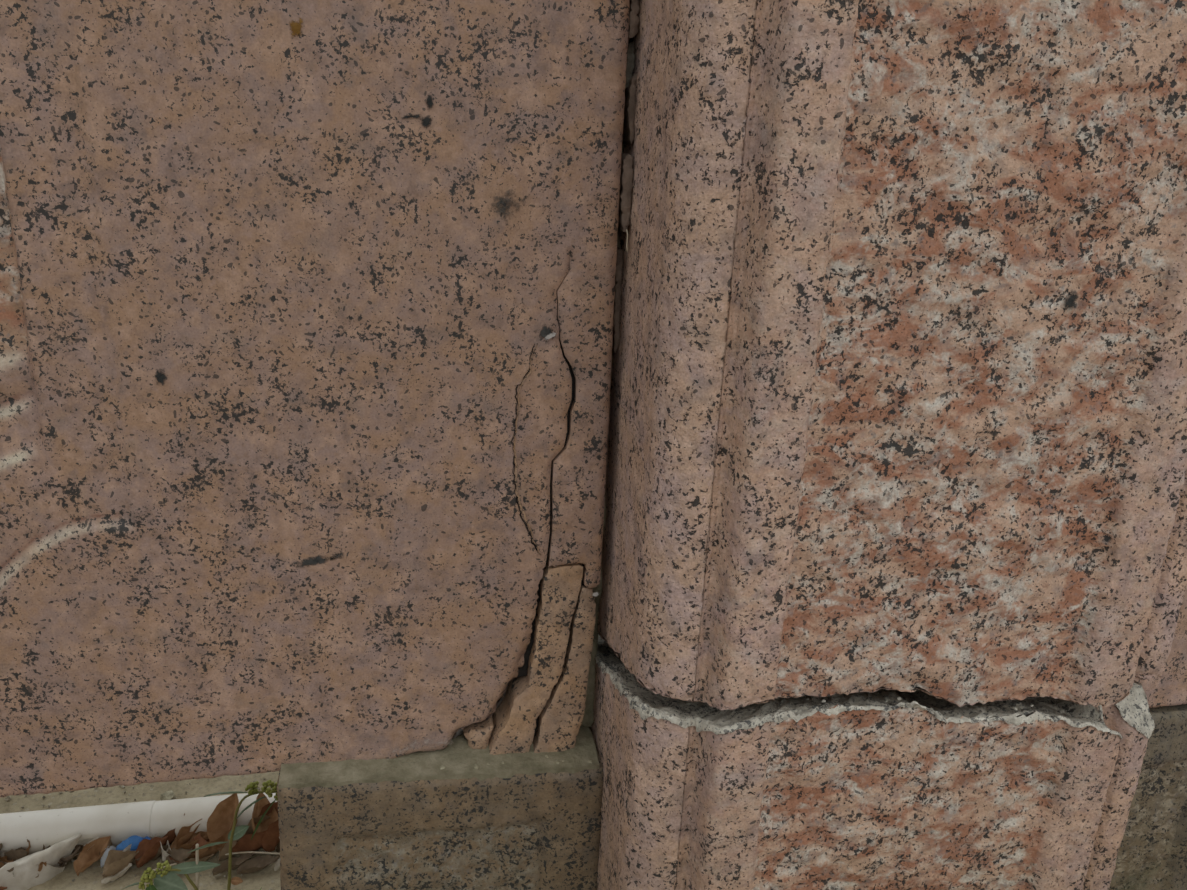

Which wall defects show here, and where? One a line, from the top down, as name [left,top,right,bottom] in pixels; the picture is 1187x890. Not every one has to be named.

crack [453,293,1155,755]